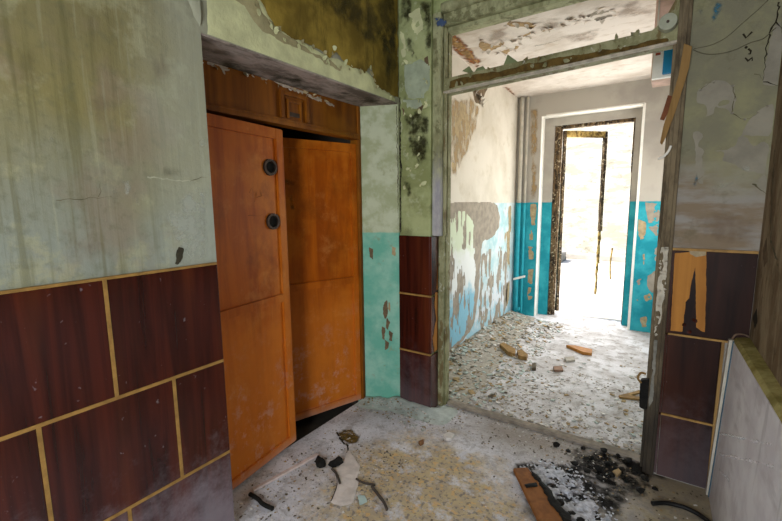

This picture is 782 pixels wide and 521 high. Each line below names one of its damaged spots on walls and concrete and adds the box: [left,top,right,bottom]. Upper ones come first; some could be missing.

peeling [207,0,430,117]
water stain [334,0,411,70]
water stain [421,3,431,47]
peeling [479,7,617,56]
crack [754,2,781,86]
water stain [406,112,428,161]
peeling [449,29,669,173]
peeling [717,104,774,194]
peeling [449,202,511,351]
peeling [527,204,537,300]
peeling [638,202,660,240]
peeling [382,300,393,350]